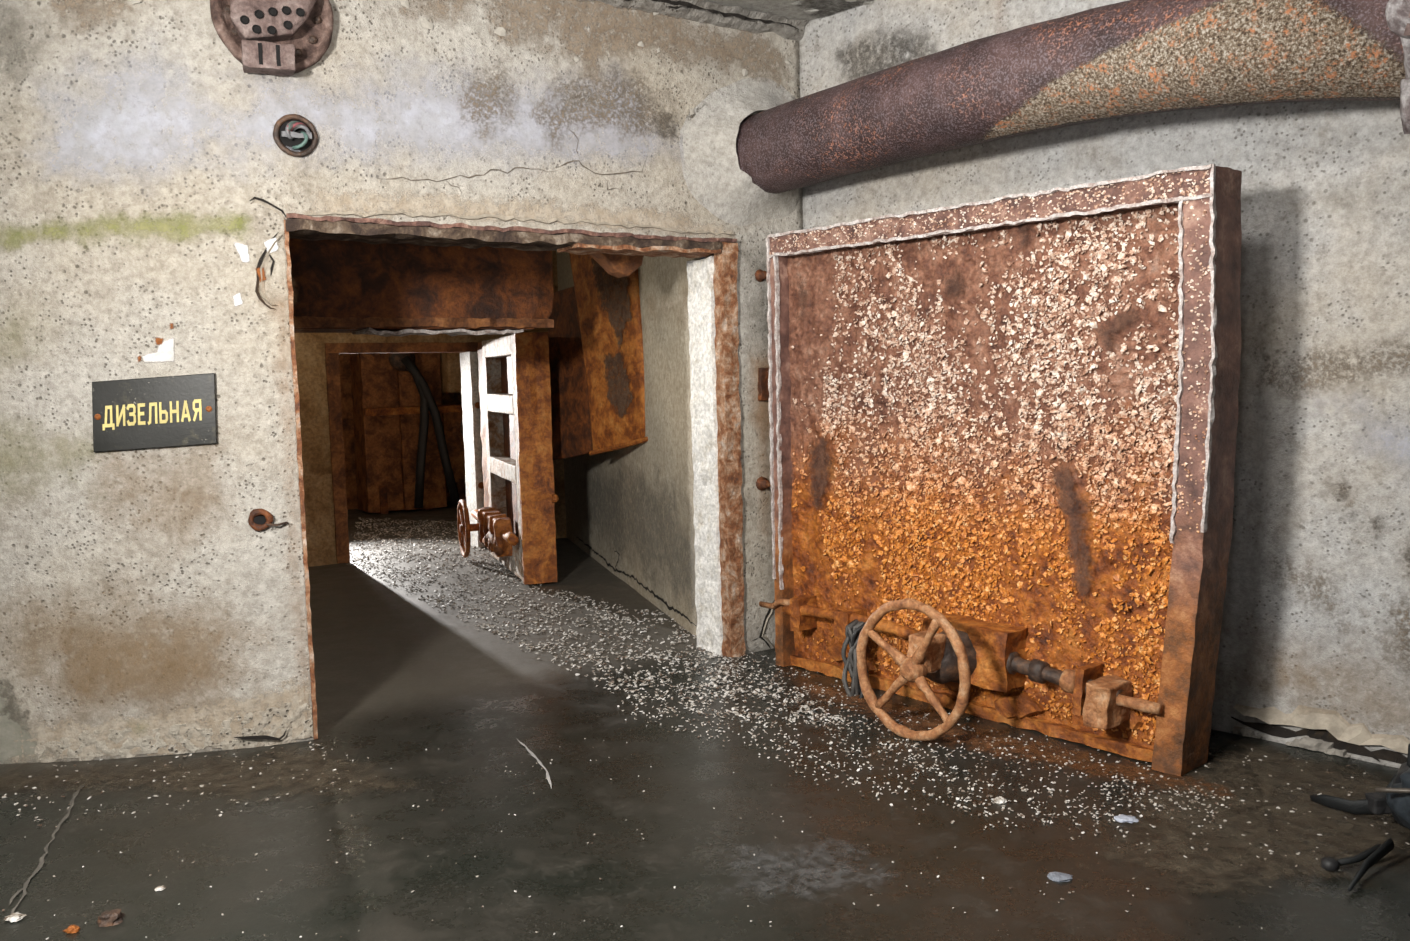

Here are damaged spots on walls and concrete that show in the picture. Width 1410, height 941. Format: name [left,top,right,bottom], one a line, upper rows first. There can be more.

water stain [56,73,220,171]
water stain [239,84,652,154]
water stain [30,623,221,694]
corrosion [797,677,1230,795]